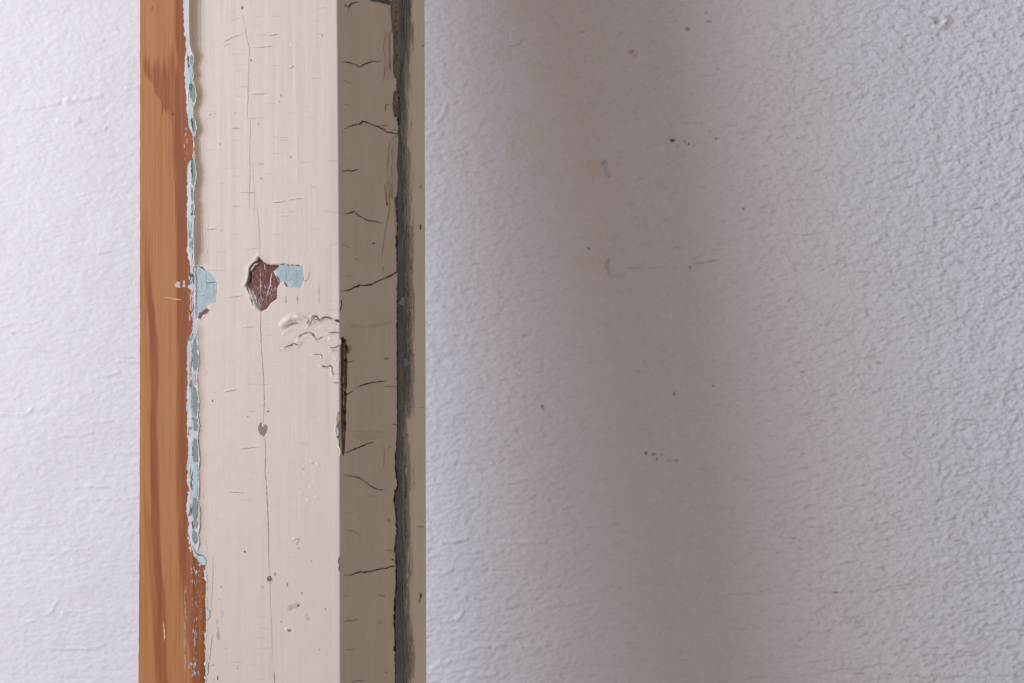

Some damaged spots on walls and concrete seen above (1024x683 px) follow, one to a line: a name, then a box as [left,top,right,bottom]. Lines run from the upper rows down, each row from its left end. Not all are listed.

peeling [193,218,217,549]
peeling [247,257,280,311]
crack [161,11,424,682]
spalling [334,337,348,456]